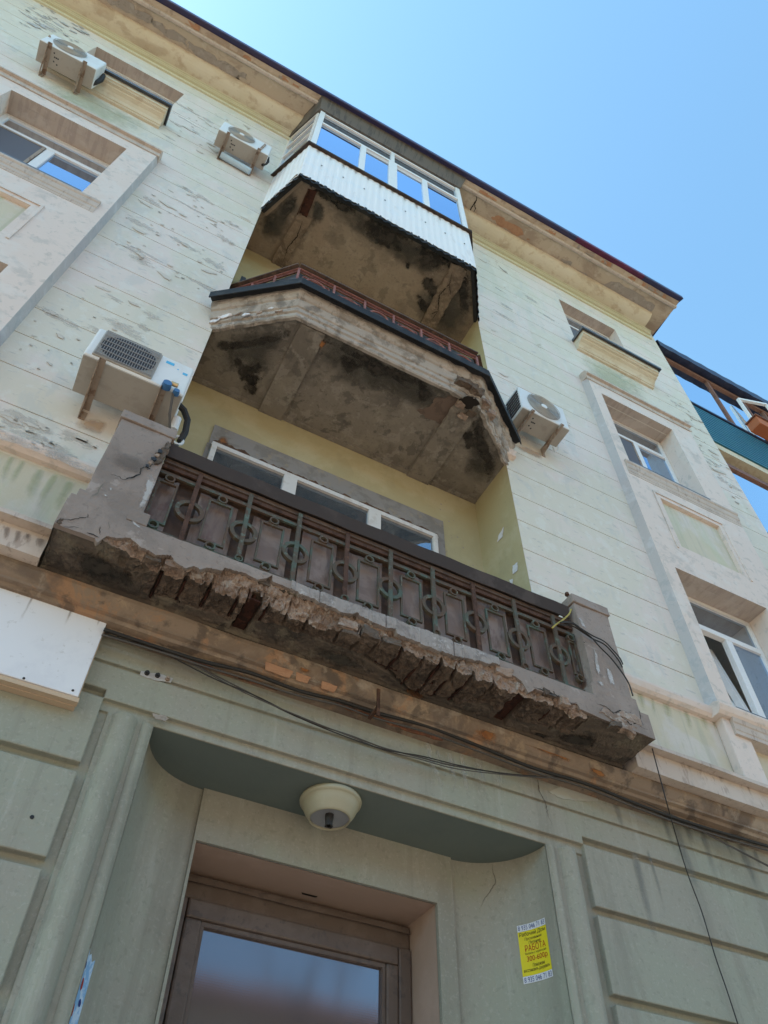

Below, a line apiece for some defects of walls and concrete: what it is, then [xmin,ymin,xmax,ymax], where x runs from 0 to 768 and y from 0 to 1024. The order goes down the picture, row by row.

flaking render [179,651,443,741]